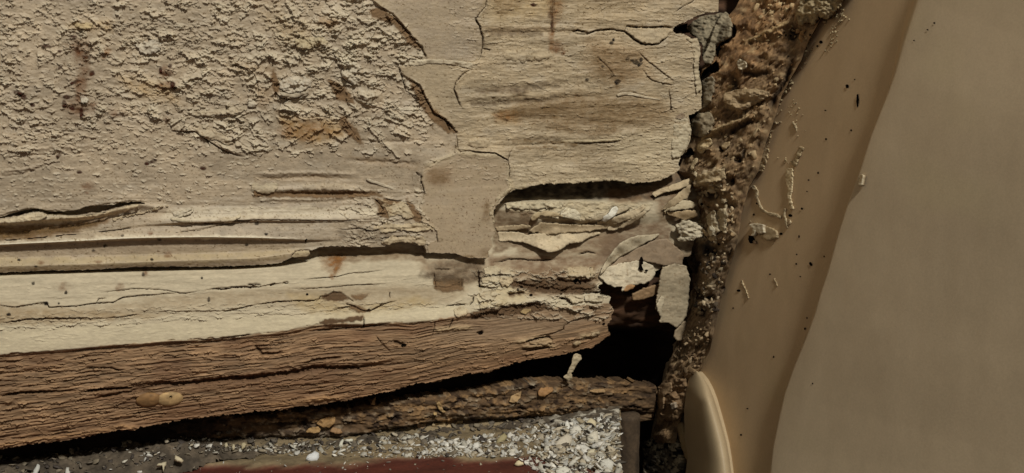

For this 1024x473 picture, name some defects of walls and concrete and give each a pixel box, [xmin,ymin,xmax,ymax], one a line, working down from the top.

spalling [370,8,421,50]
spalling [412,82,456,133]
crack [400,6,510,176]
crack [572,0,694,110]
peeling [627,23,702,93]
crack [4,227,133,240]
crack [4,249,392,353]
crack [182,173,425,239]
crack [431,259,554,337]
peeling [454,204,691,341]
peeling [652,113,730,245]
flaking render [749,223,779,241]